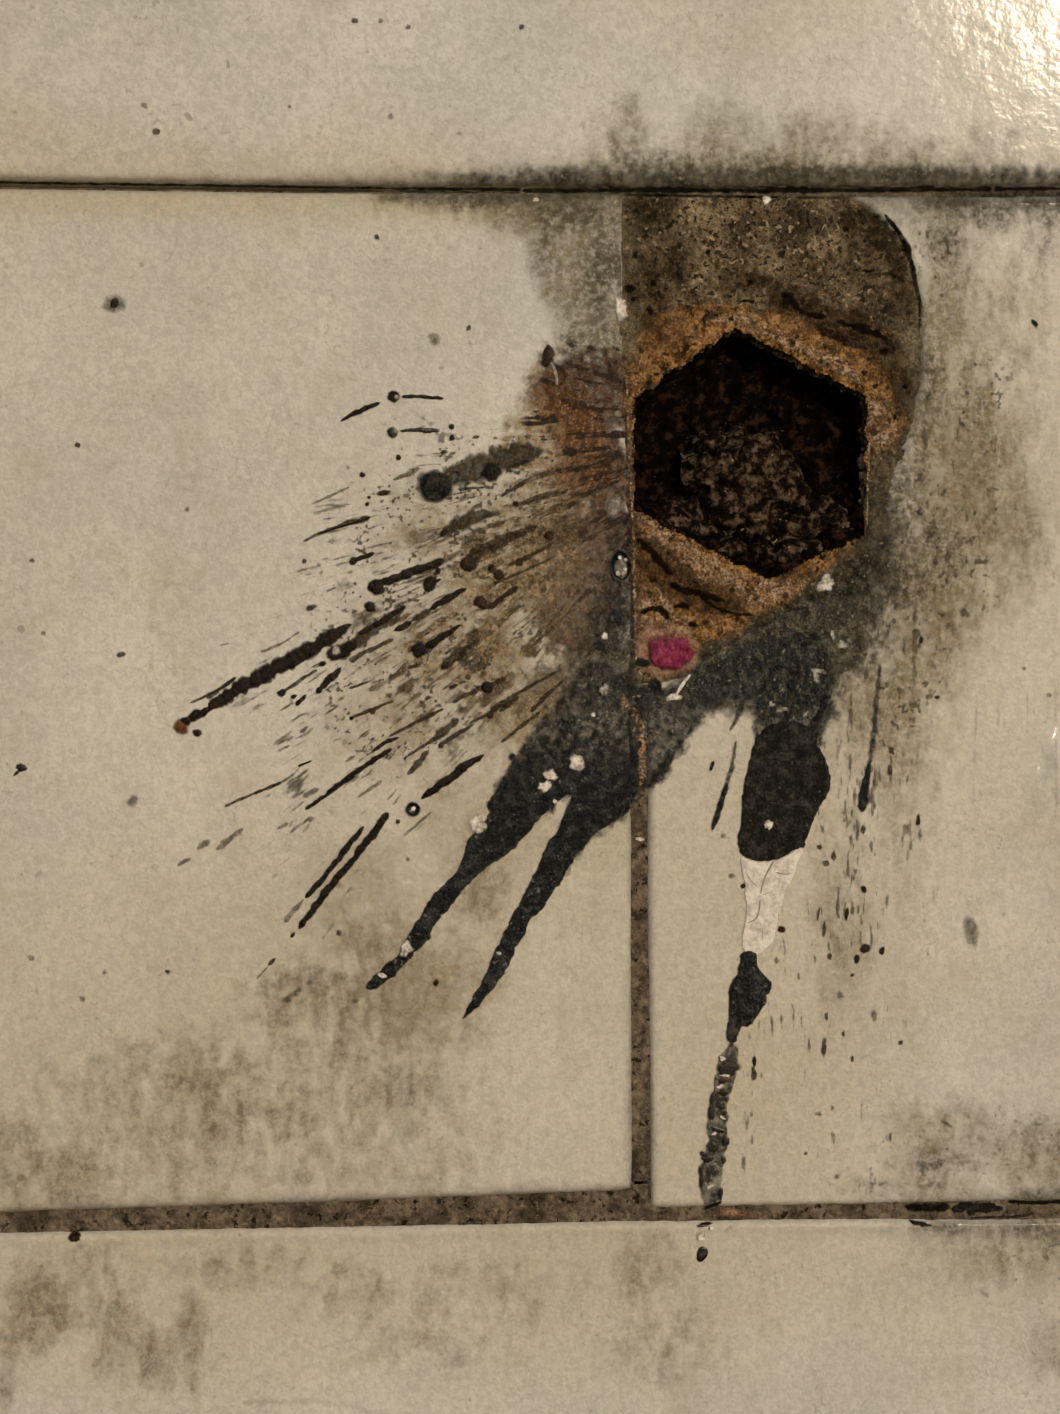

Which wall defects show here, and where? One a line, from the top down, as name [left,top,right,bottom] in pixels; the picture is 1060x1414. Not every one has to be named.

peeling [616,298,627,320]
leakage [449,124,1060,371]
peeling [817,574,833,591]
leakage [810,228,1040,977]
leakage [710,696,746,837]
leakage [407,949,457,1019]